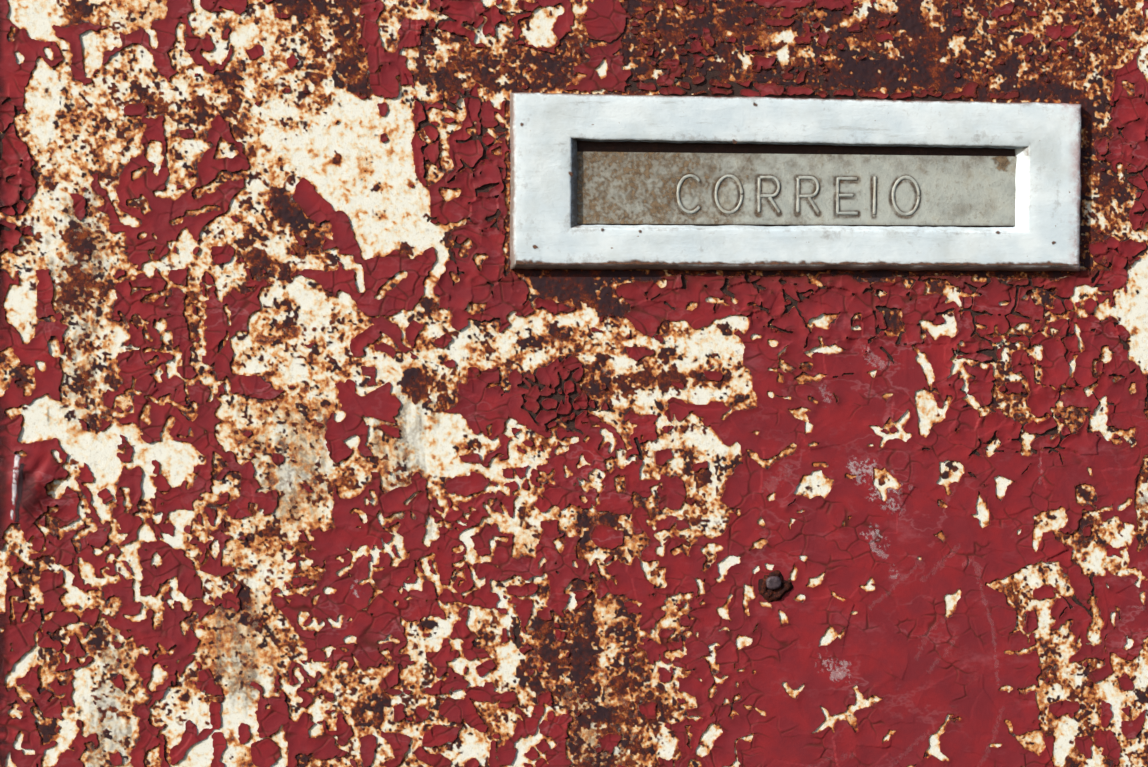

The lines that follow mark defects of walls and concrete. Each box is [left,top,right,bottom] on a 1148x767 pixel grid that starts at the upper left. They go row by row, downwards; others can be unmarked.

rust [0,0,413,728]
peeling [0,0,915,767]
rust [295,576,696,767]
crack [513,616,521,649]
crack [501,350,642,460]
rust [558,418,742,566]
rust [380,0,1148,457]
crack [628,93,1148,478]
peeling [971,475,1015,528]
peeling [985,454,1148,767]
crack [1059,575,1095,618]
rust [1022,617,1148,767]